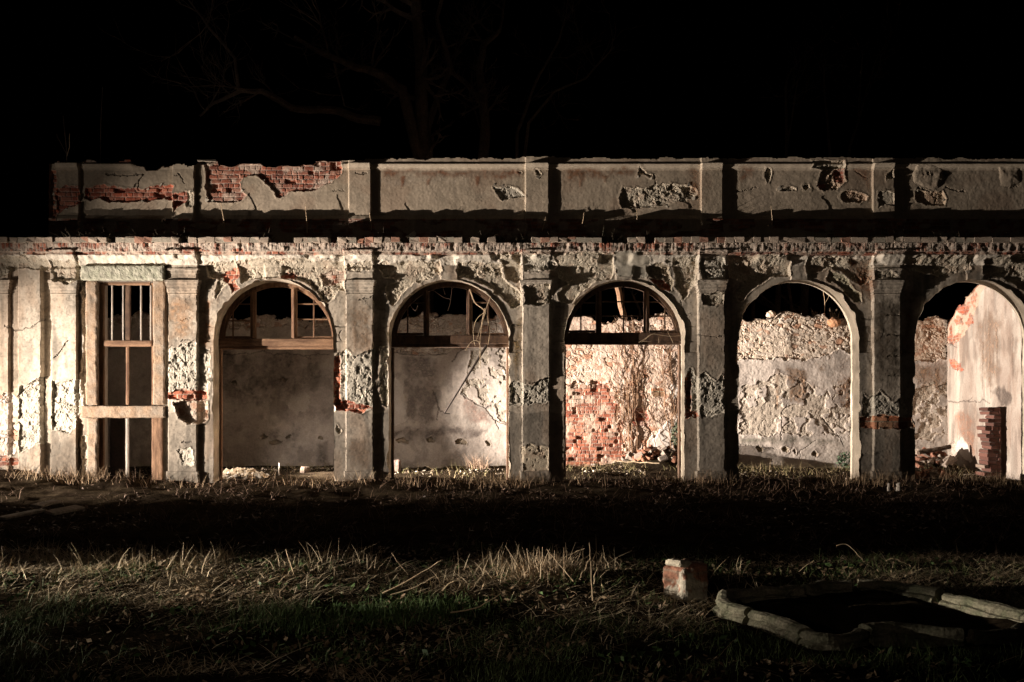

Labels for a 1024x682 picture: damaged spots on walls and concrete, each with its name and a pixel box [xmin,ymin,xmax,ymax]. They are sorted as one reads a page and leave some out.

flaking render [49,161,343,218]
flaking render [493,184,526,201]
flaking render [619,165,698,209]
flaking render [765,159,895,208]
flaking render [915,189,947,206]
flaking render [806,253,1024,344]
flaking render [0,252,99,477]
flaking render [166,340,213,424]
flaking render [333,345,409,425]
flaking render [461,348,552,423]
flaking render [566,379,626,467]
flaking render [684,367,973,462]